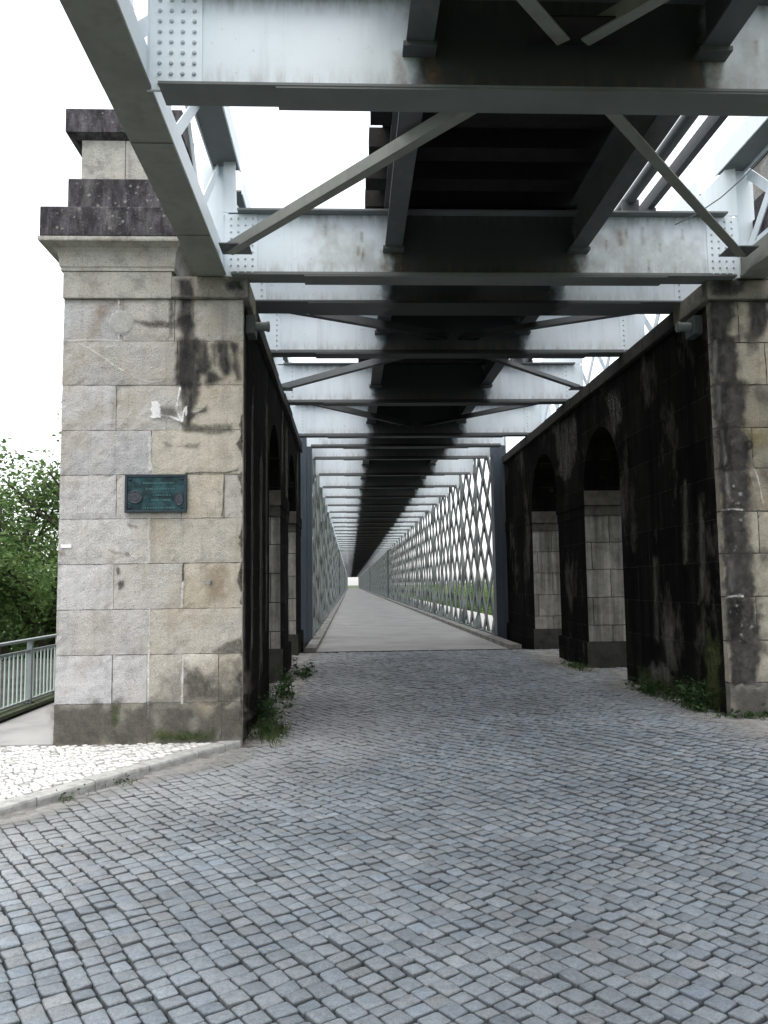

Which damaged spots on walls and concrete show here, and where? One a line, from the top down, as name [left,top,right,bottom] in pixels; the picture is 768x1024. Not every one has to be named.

damp [141,279,239,433]
damp [641,280,768,717]